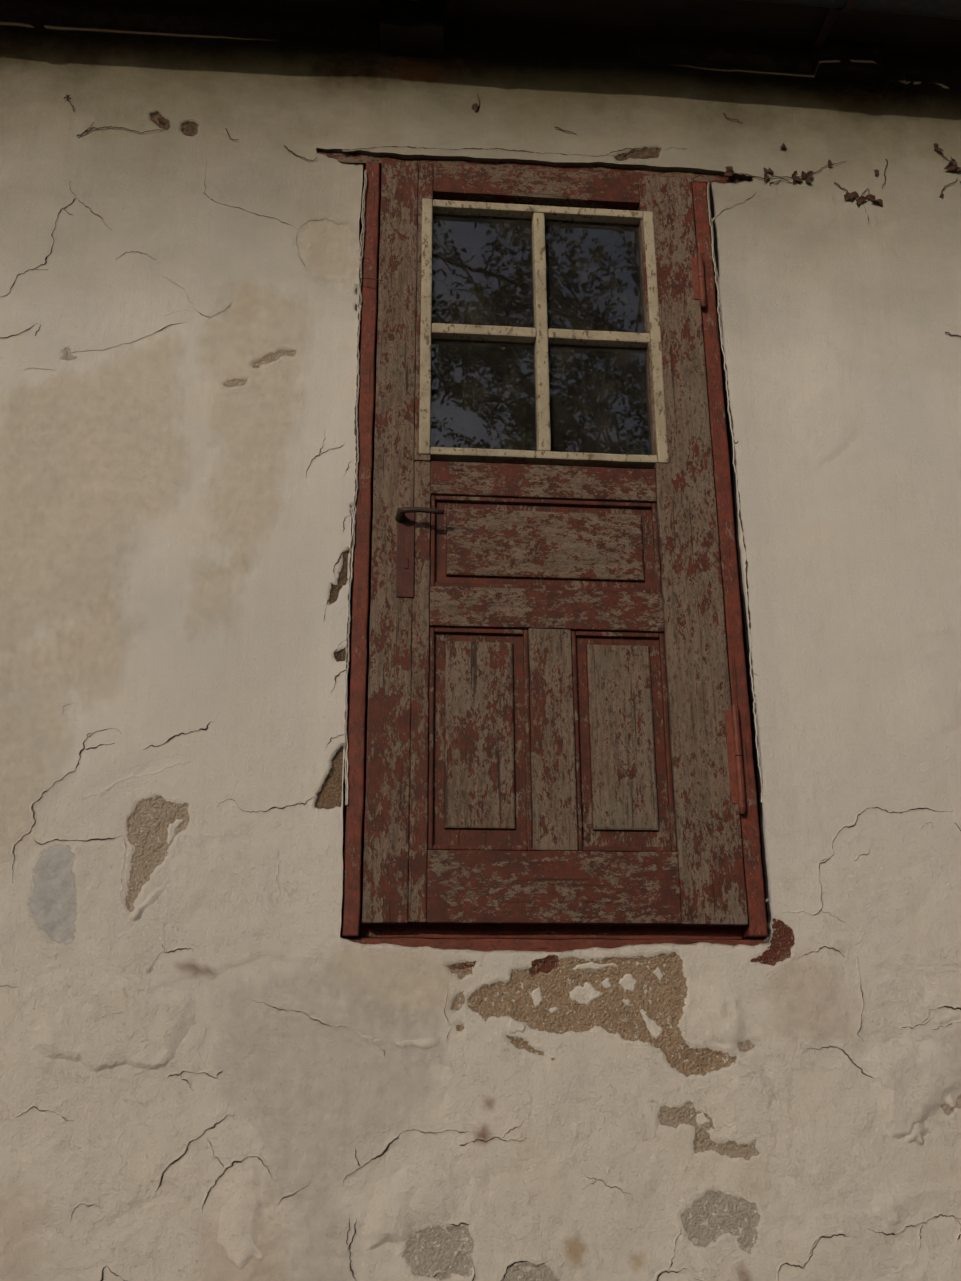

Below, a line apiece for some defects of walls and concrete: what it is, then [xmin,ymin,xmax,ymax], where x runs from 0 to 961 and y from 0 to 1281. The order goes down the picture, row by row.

crack [0,181,233,371]
crack [10,703,212,883]
spalling [314,746,343,809]
peeling [125,795,189,911]
spalling [750,918,795,966]
crack [782,805,961,1078]
spalling [447,952,754,1077]
crack [155,1113,311,1213]
crack [342,1120,531,1186]
spalling [658,1101,759,1160]
spalling [681,1190,759,1253]
crack [776,1212,961,1281]